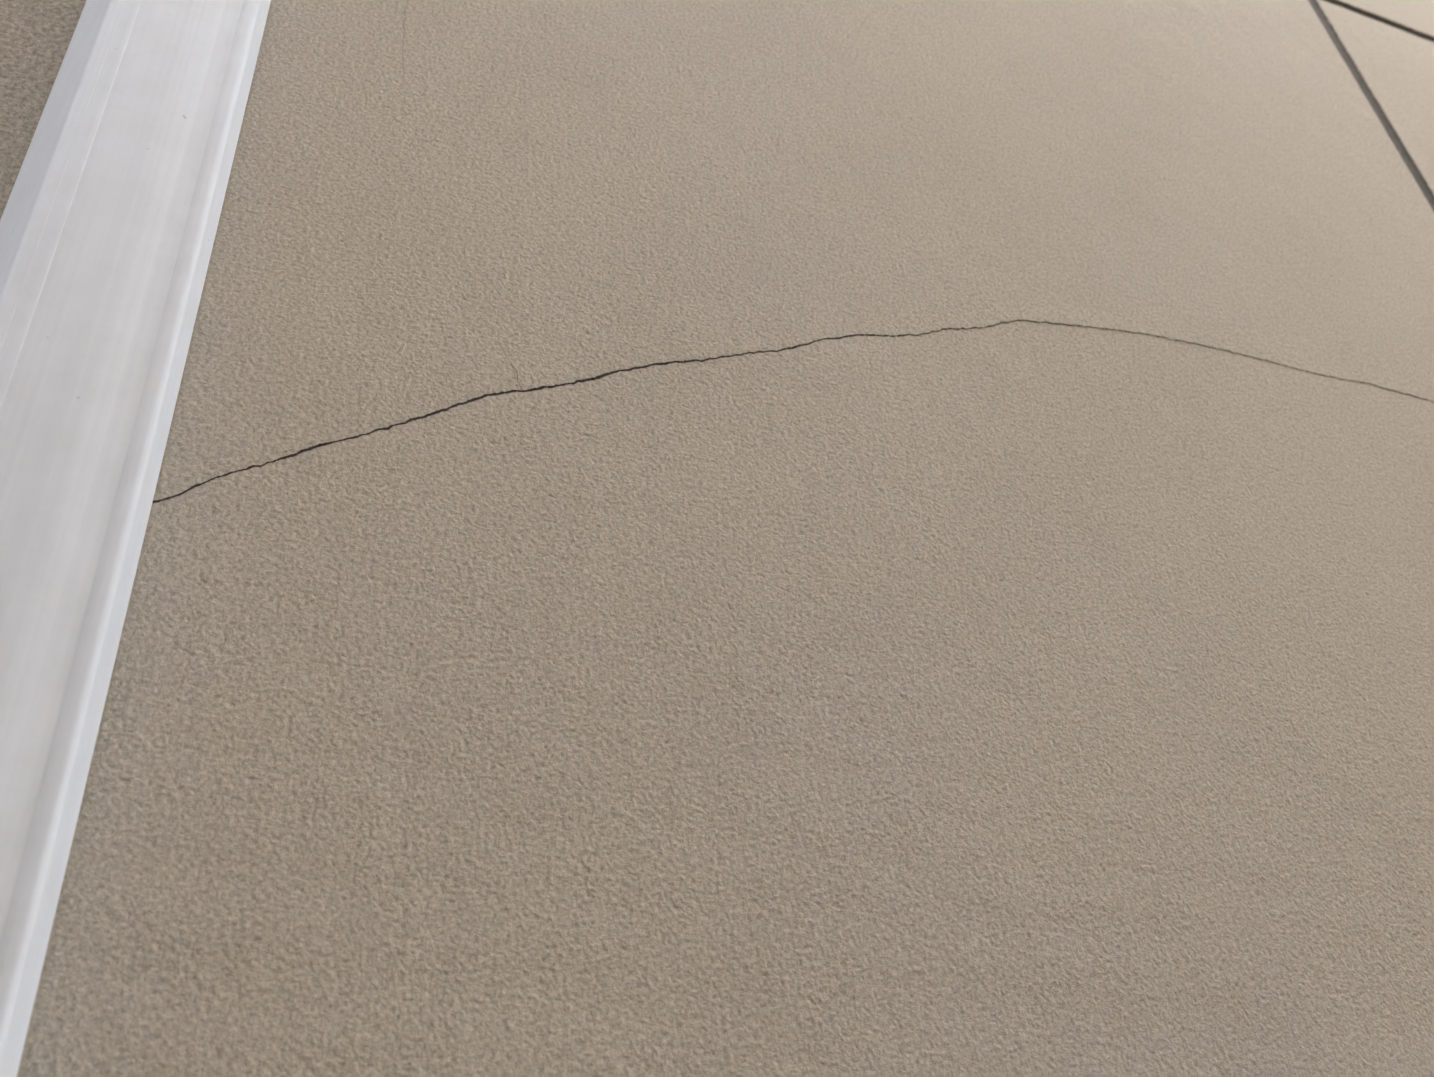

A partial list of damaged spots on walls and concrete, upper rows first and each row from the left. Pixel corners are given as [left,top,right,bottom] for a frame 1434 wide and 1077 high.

crack [152,320,1434,503]